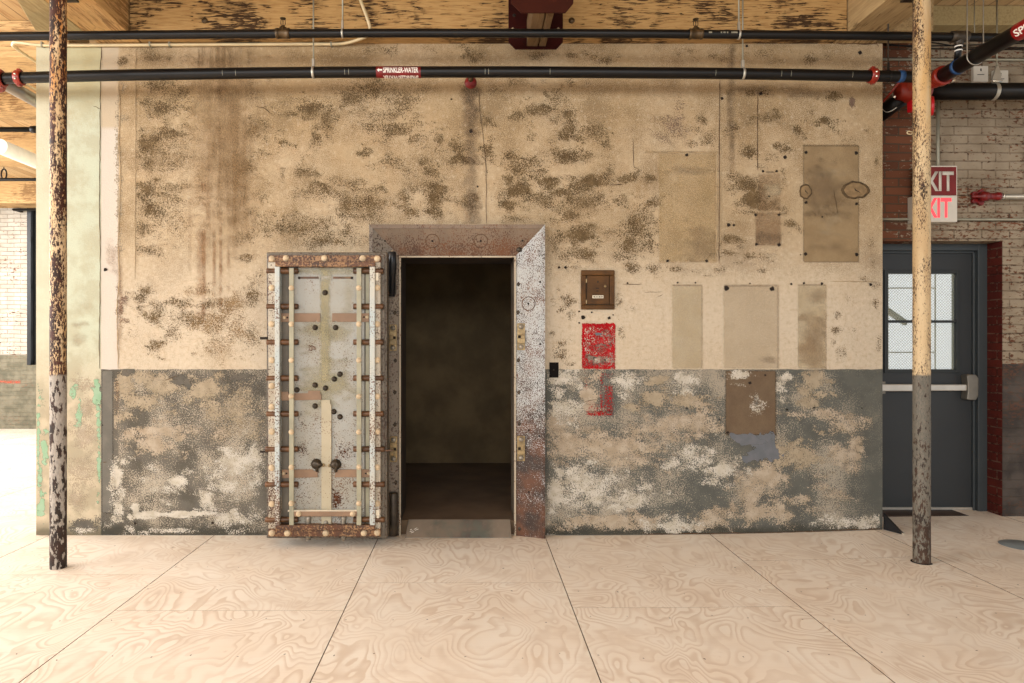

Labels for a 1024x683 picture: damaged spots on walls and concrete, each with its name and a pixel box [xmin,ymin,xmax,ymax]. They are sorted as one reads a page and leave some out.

peeling [68,78,880,535]